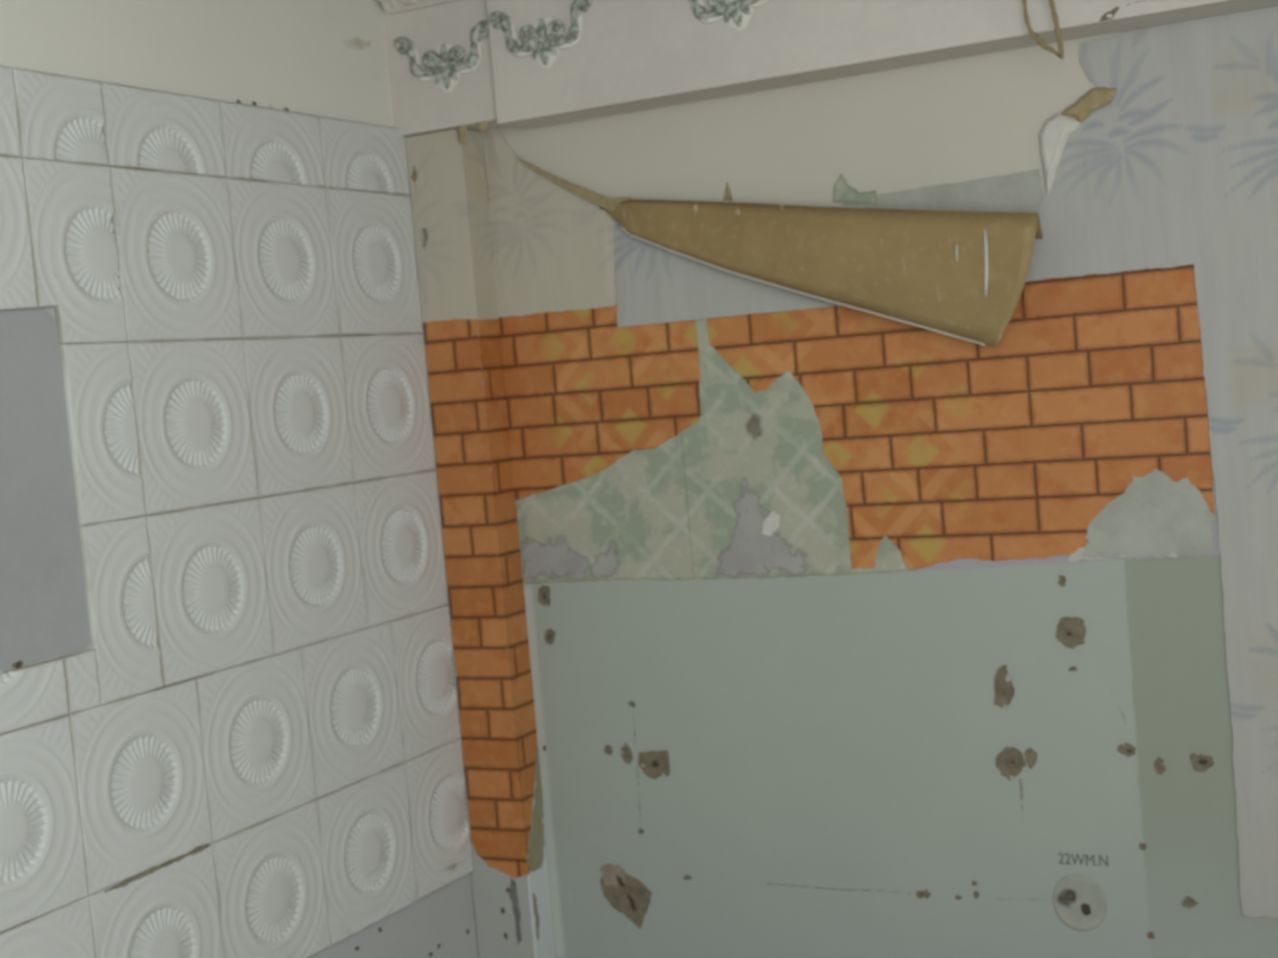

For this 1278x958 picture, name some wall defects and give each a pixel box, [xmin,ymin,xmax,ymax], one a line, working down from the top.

flaking render [841,169,1043,213]
flaking render [1056,617,1087,648]
flaking render [994,665,1015,711]
flaking render [604,743,670,779]
flaking render [996,747,1038,781]
flaking render [600,864,652,929]